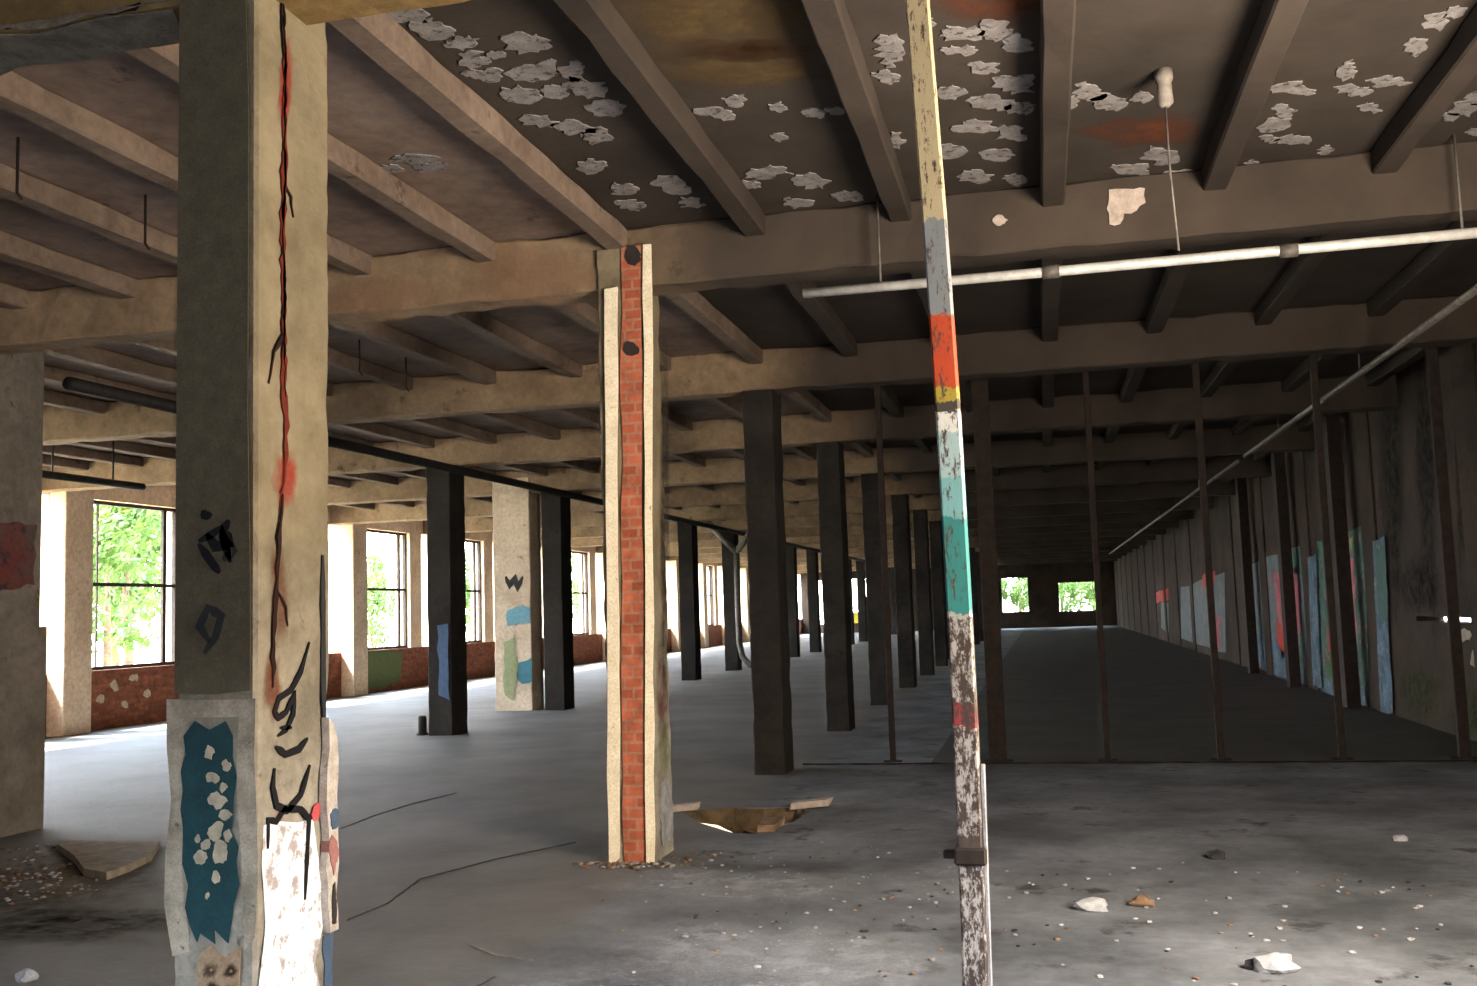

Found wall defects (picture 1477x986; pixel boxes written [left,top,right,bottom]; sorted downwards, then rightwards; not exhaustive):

spalling [0,0,179,76]
peeling [382,9,707,211]
peeling [693,94,748,121]
peeling [871,33,905,85]
peeling [931,18,1036,187]
peeling [1071,81,1154,111]
peeling [1256,59,1413,155]
peeling [1403,5,1468,58]
peeling [1443,91,1477,136]
peeling [741,164,865,209]
spalling [1107,145,1194,226]
crack [267,3,294,688]